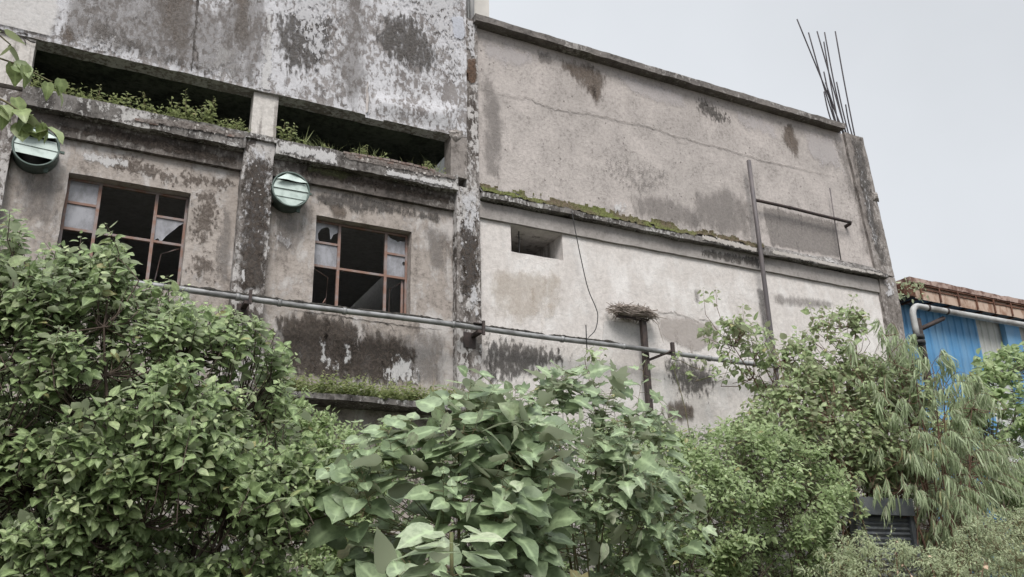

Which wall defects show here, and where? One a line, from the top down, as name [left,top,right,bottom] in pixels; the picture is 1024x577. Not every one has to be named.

peeling [84,33,121,54]
peeling [284,0,333,62]
leakage [562,61,605,101]
peeling [98,118,292,283]
leakage [698,98,886,268]
peeling [459,191,482,316]
leakage [276,312,442,385]
leakage [484,333,573,384]